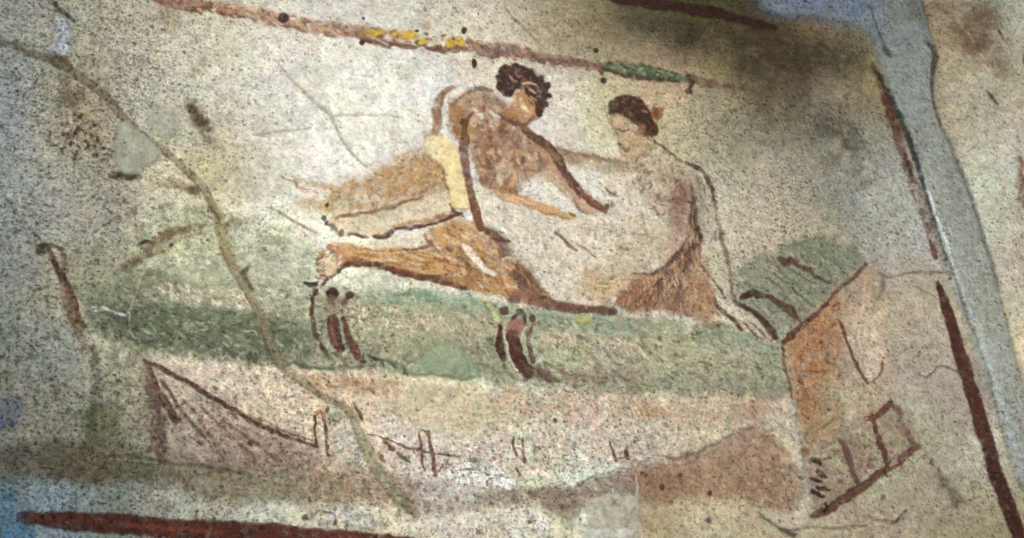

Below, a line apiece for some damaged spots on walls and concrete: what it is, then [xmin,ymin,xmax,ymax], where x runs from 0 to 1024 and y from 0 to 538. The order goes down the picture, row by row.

crack [0,37,420,516]